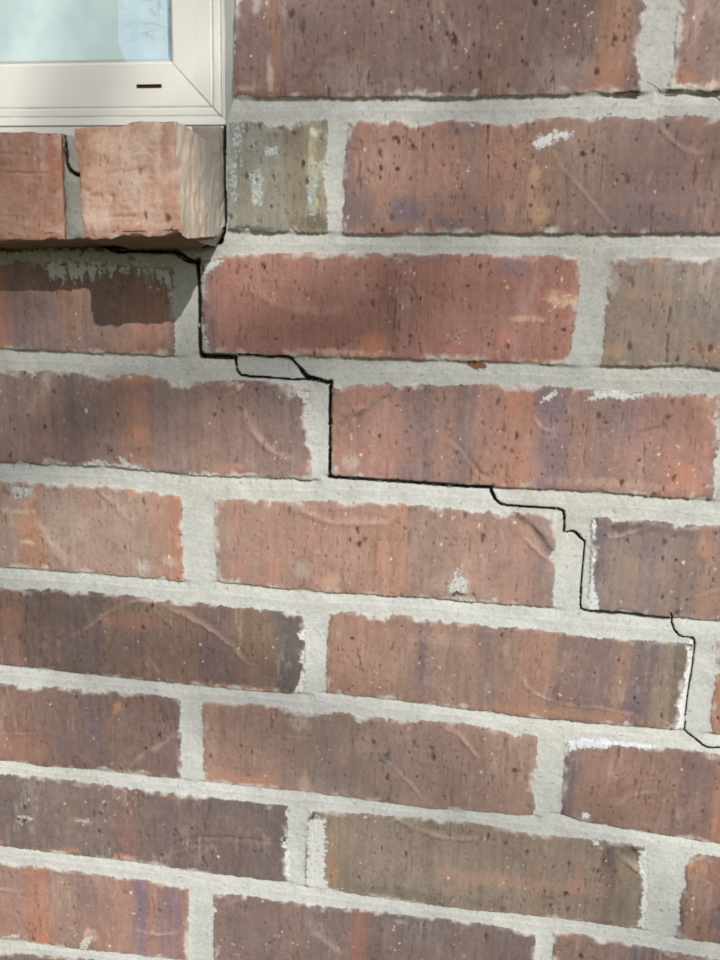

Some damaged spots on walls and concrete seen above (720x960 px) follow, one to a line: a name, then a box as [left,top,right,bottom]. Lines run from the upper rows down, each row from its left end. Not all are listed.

crack [64,135,80,177]
crack [104,125,720,748]